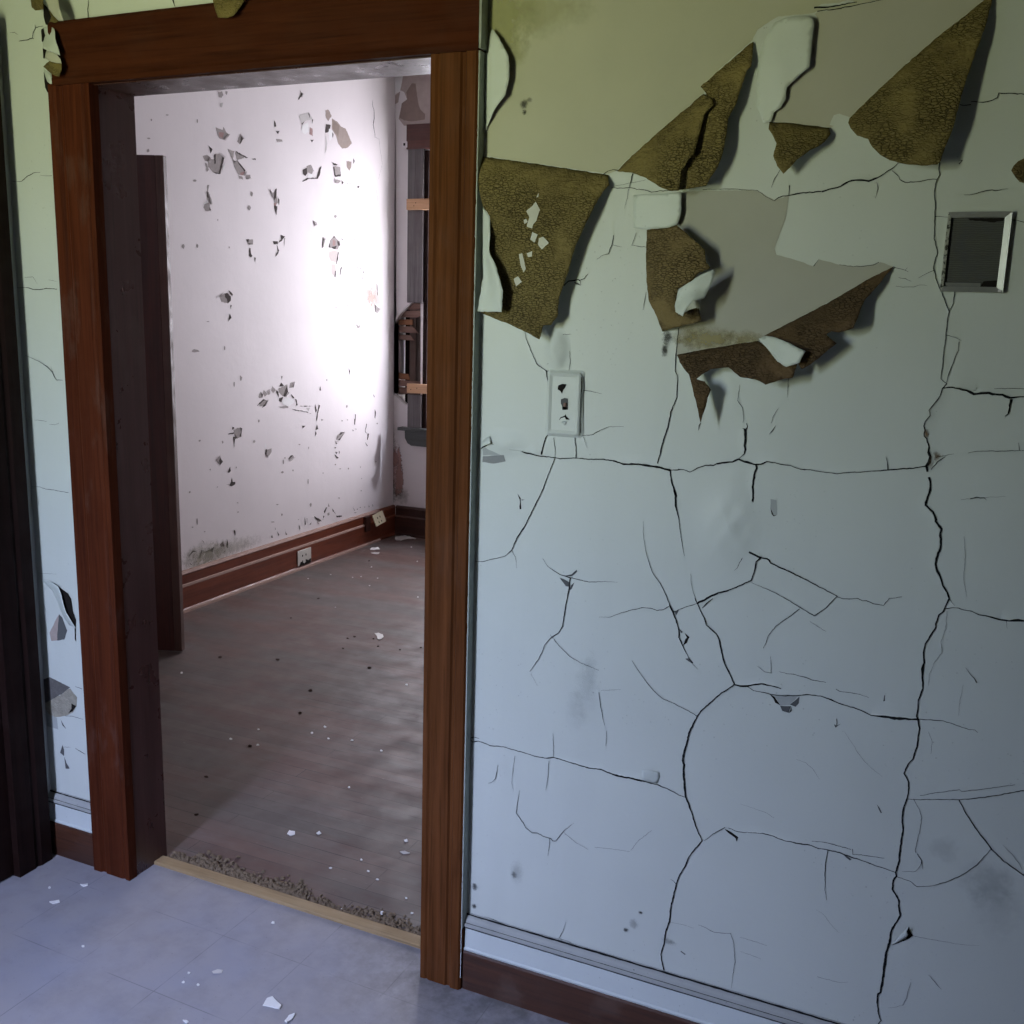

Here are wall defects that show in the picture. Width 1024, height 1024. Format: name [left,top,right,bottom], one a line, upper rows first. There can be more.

peeling [203,126,256,210]
peeling [299,110,359,188]
peeling [1011,159,1024,183]
peeling [477,0,992,423]
peeling [322,236,364,278]
peeling [217,291,233,321]
peeling [257,376,323,435]
peeling [210,427,242,486]
peeling [334,405,382,491]
peeling [42,580,75,641]
crack [471,163,1024,1024]
flaking render [44,677,77,729]